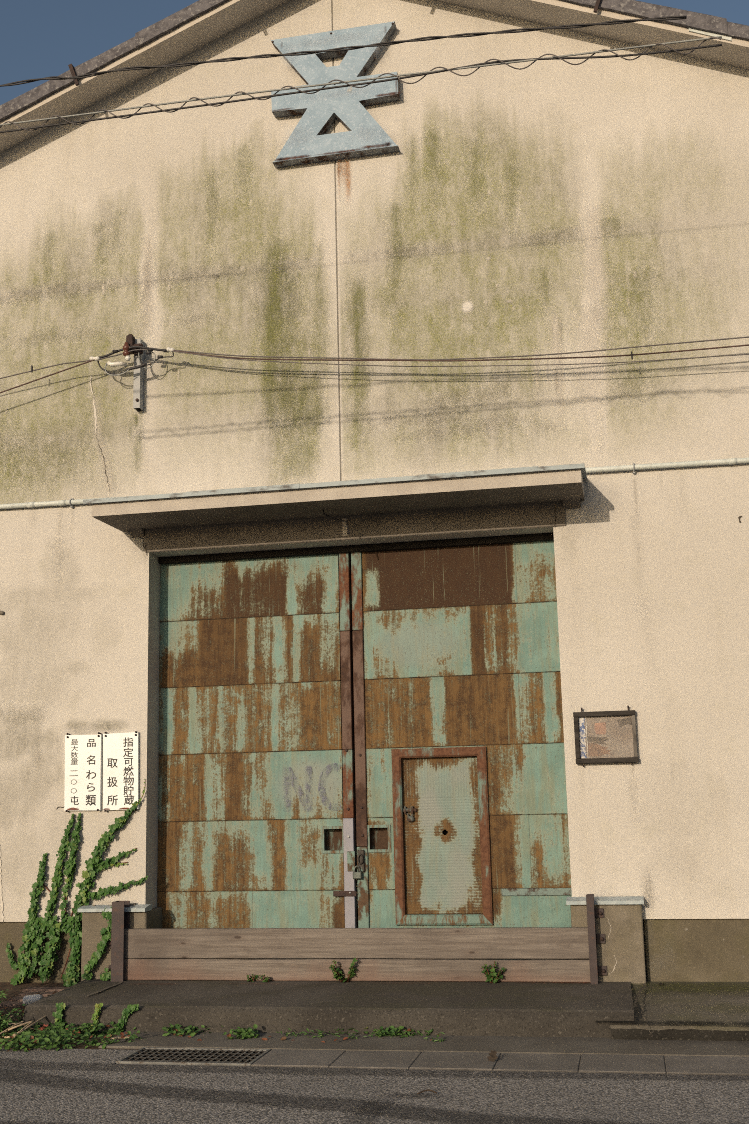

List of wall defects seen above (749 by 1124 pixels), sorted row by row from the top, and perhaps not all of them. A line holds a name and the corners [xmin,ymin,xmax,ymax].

crack [90,375,110,491]